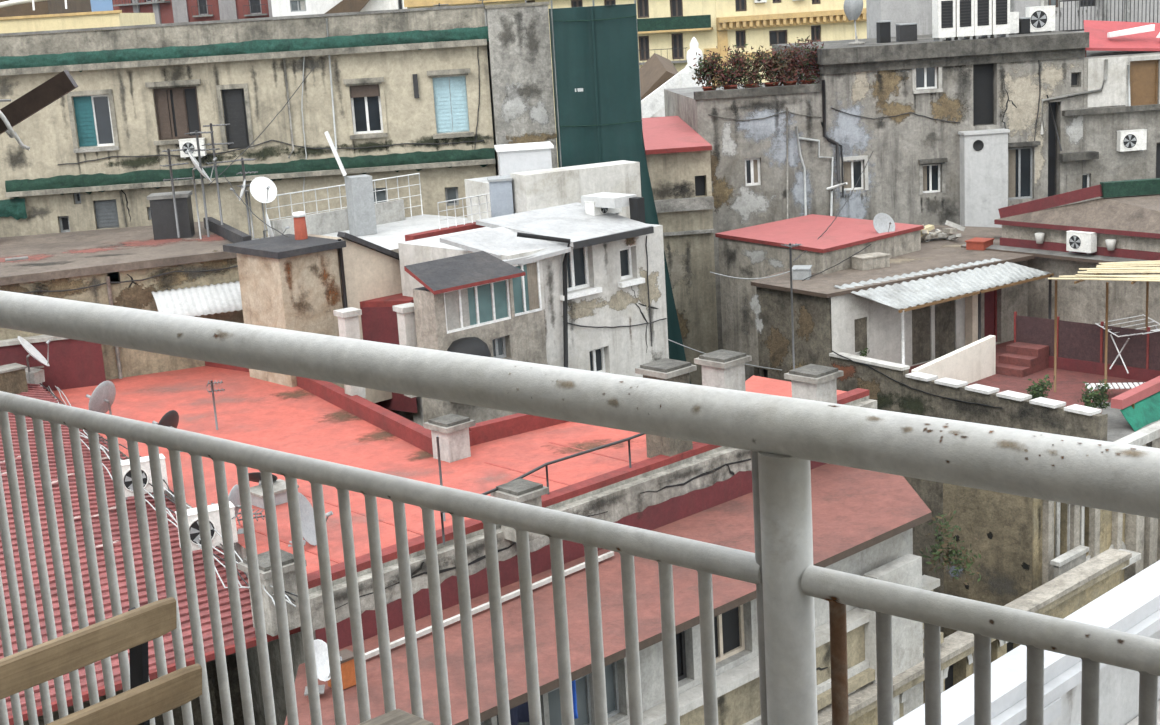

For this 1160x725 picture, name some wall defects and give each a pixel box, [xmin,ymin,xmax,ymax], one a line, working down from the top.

leakage [500,14,539,62]
leakage [507,86,541,97]
spalling [930,93,966,124]
flaking render [826,70,915,219]
corrosion [311,259,340,304]